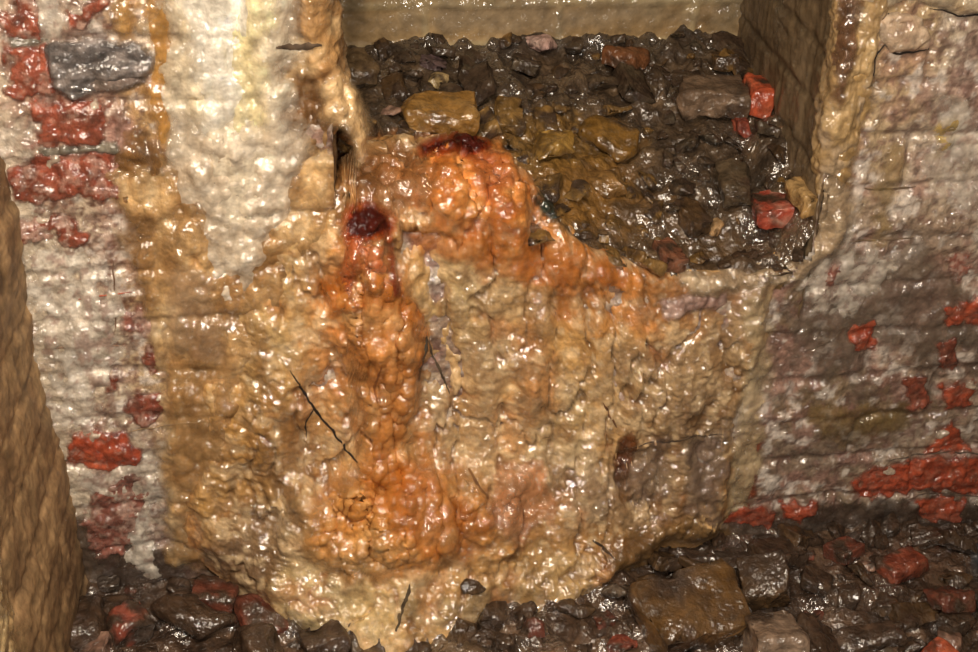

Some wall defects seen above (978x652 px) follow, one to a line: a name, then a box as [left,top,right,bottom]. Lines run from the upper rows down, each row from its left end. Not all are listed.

damp [36,0,83,44]
crack [873,44,929,76]
spalling [0,0,154,248]
damp [924,100,978,209]
rust [321,131,492,340]
damp [23,250,124,433]
damp [76,0,352,586]
crack [290,371,357,462]
damp [182,0,889,652]
spalling [902,375,978,412]
spalling [935,296,978,370]
spalling [852,423,978,524]